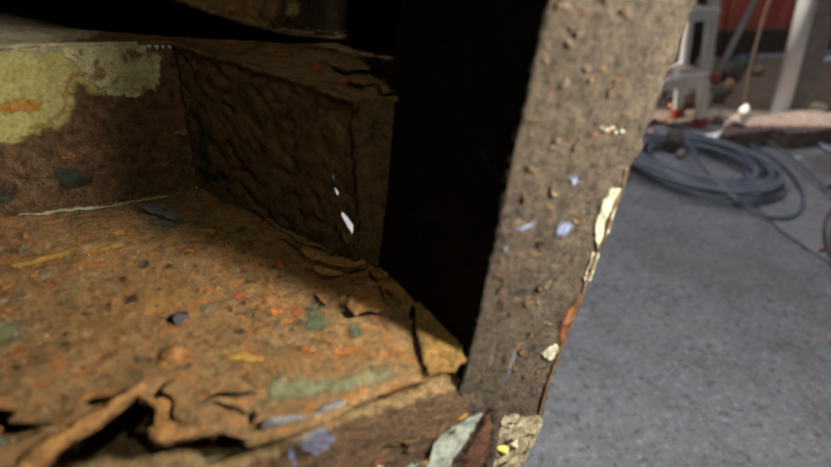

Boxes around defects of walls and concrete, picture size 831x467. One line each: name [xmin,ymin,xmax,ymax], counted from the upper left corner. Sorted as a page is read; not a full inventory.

peeling [60,44,162,98]
corrosion [0,0,396,225]
corrosion [9,221,138,279]
corrosion [300,246,389,315]
corrosion [214,341,264,364]